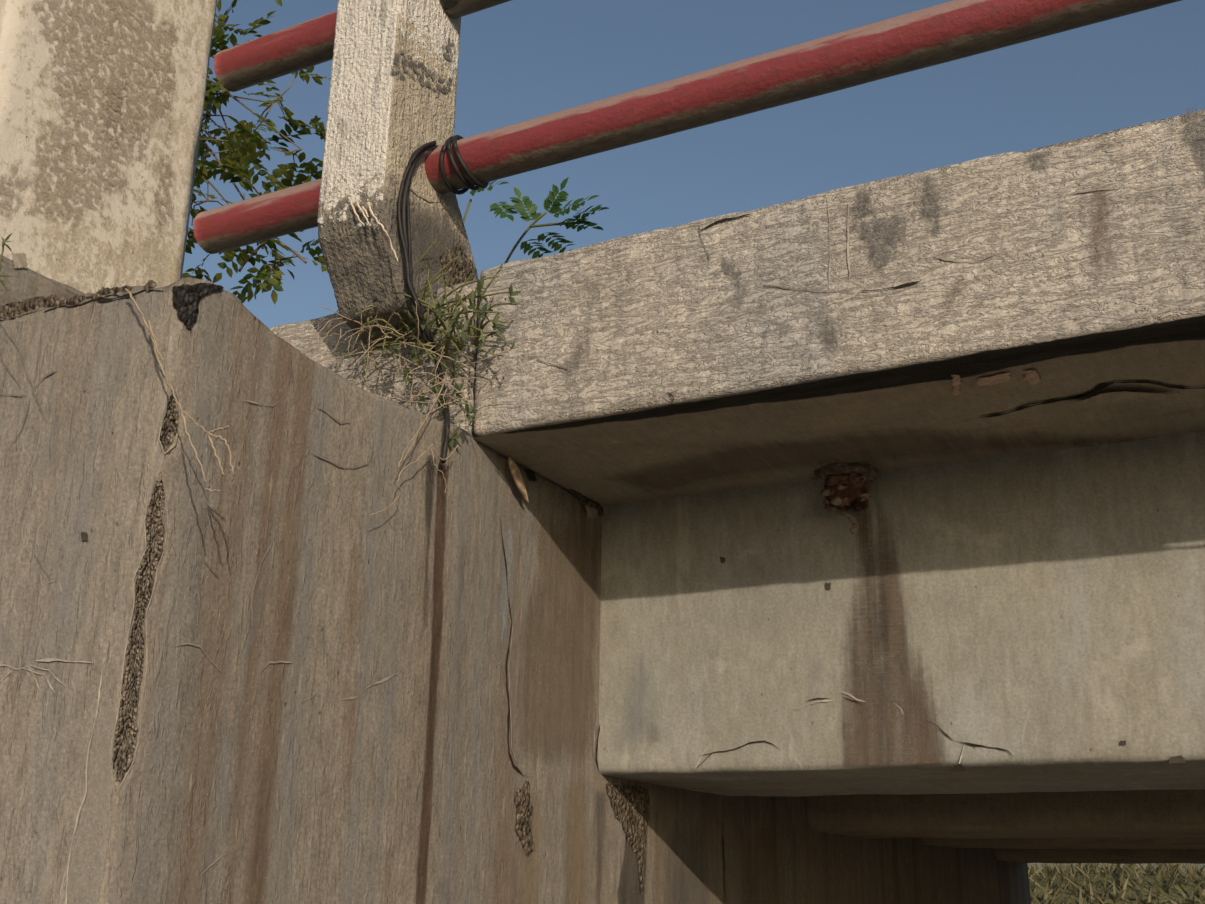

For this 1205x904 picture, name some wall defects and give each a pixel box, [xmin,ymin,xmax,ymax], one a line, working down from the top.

peeling [441,0,459,10]
crack [0,280,164,450]
spalling [158,390,179,455]
crack [963,381,1205,421]
spalling [111,472,168,794]
crack [500,520,534,778]
water stain [844,512,943,766]
crack [0,658,104,904]
spalling [514,781,536,856]
spalling [606,781,650,895]
crack [694,741,779,770]
crack [796,691,1014,772]